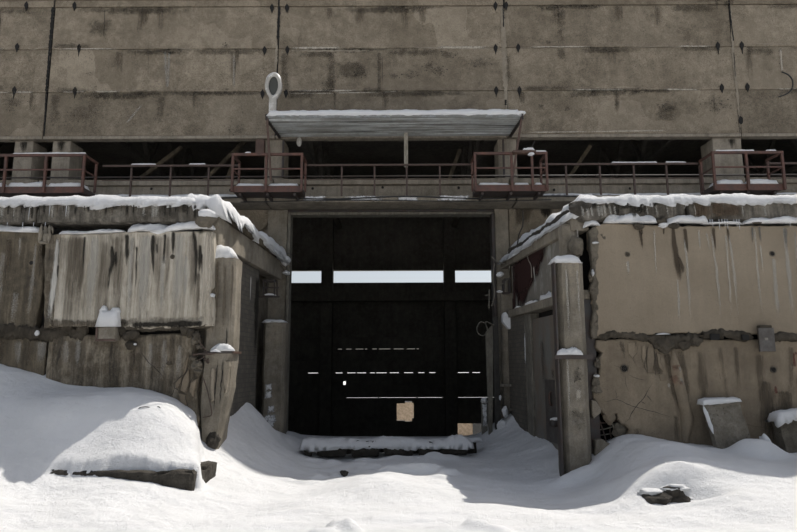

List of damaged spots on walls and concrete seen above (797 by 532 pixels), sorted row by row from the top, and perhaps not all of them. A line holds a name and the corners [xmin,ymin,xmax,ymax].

damp [108,235,138,287]
damp [151,232,175,270]
rust [512,248,545,309]
spalling [587,226,606,339]
damp [663,228,688,276]
crack [606,342,663,421]